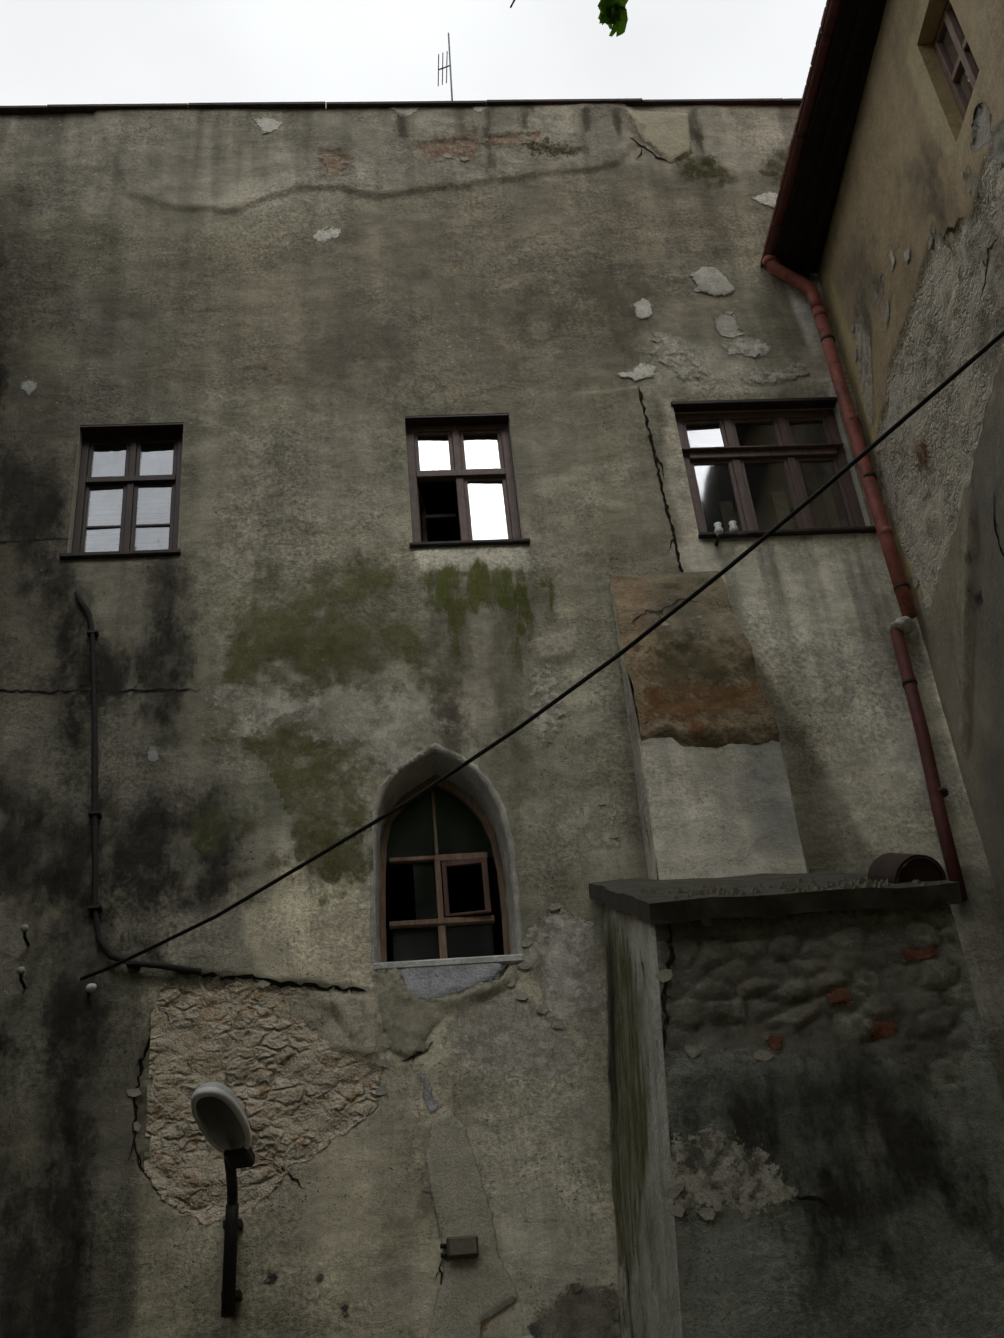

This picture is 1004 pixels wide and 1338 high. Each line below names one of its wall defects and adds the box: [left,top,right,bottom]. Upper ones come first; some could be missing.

peeling [313,226,341,243]
peeling [631,298,654,319]
peeling [618,332,708,381]
peeling [715,311,810,386]
spalling [851,101,1004,609]
crack [631,388,699,623]
water stain [219,602,471,773]
crack [177,972,367,992]
spalling [127,903,608,1225]
water stain [606,939,614,1111]